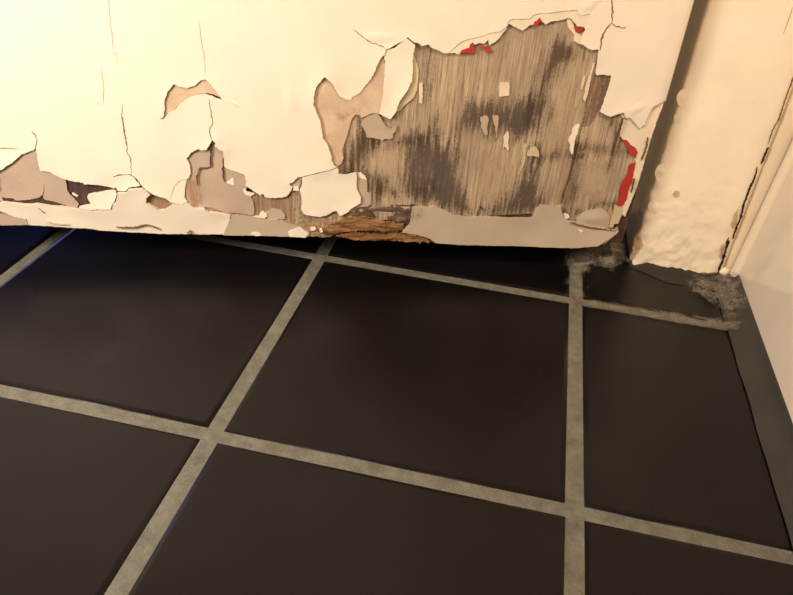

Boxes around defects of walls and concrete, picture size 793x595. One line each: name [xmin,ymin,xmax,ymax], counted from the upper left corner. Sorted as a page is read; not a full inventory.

crack [600,0,625,50]
peeling [161,79,221,119]
peeling [184,10,664,248]
damp [340,35,621,217]
peeling [0,147,174,226]
crack [700,78,793,275]
damp [568,243,746,328]